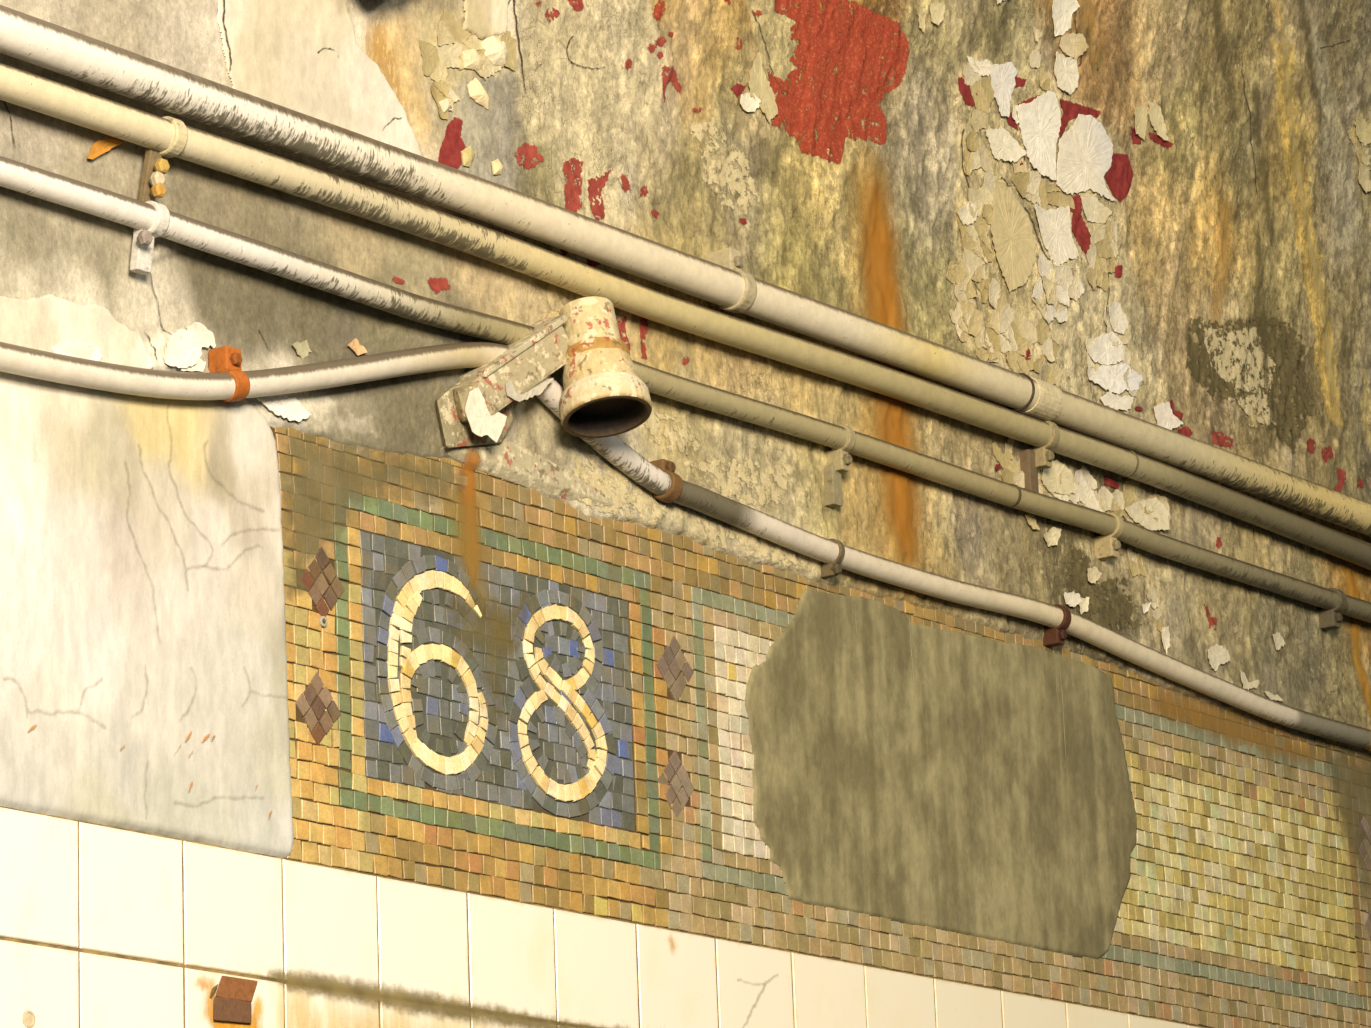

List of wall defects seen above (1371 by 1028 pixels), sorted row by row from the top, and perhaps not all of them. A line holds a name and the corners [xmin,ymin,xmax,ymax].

crack [223,0,232,70]
flaking render [217,0,421,156]
peeling [419,0,517,169]
peeling [731,0,945,164]
corrosion [863,172,900,330]
peeling [946,0,1192,437]
corrosion [460,452,479,583]
corrosion [876,393,912,450]
corrosion [884,465,917,567]
peeling [1041,460,1171,531]
flaking render [1186,315,1364,492]
corrosion [201,981,261,1028]